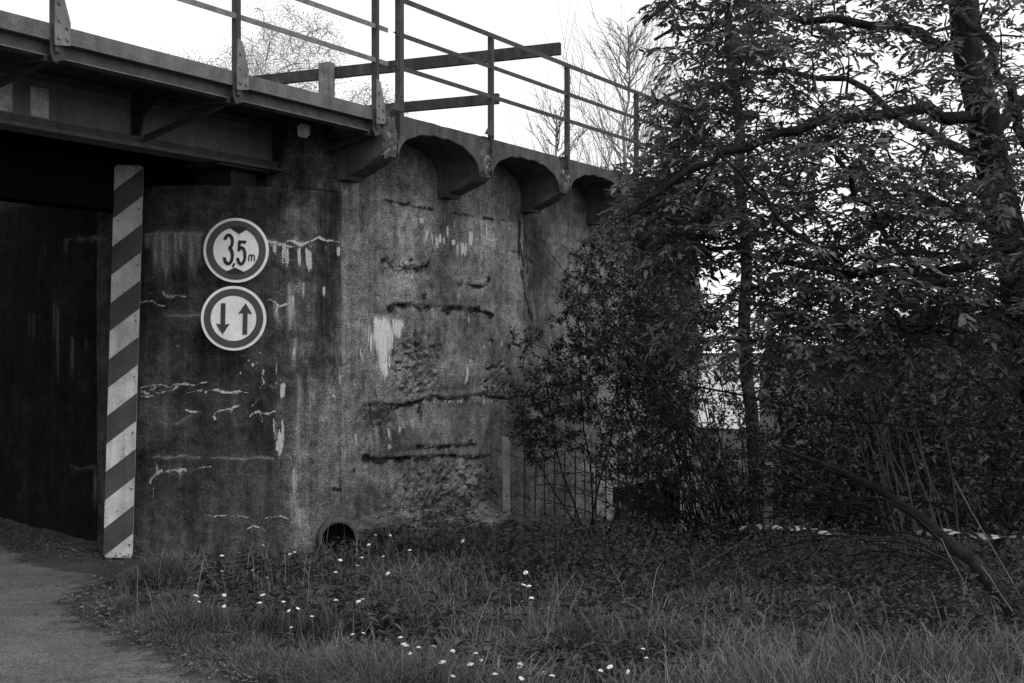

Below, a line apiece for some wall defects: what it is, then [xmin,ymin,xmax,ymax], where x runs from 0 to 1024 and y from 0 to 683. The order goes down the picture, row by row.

peeling [368,308,443,405]
efflorescence [273,419,284,455]